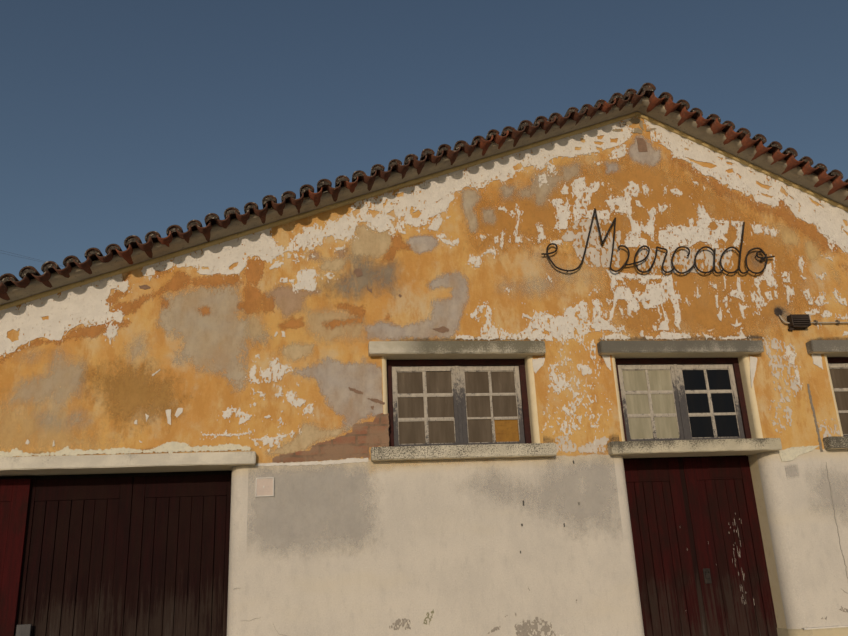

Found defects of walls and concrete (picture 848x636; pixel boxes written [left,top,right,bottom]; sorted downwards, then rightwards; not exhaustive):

peeling [0,116,848,357]
peeling [433,174,848,454]
peeling [166,408,183,425]
flaking render [200,354,389,463]
crack [807,384,848,594]
spalling [389,618,411,630]
spalling [505,614,564,636]